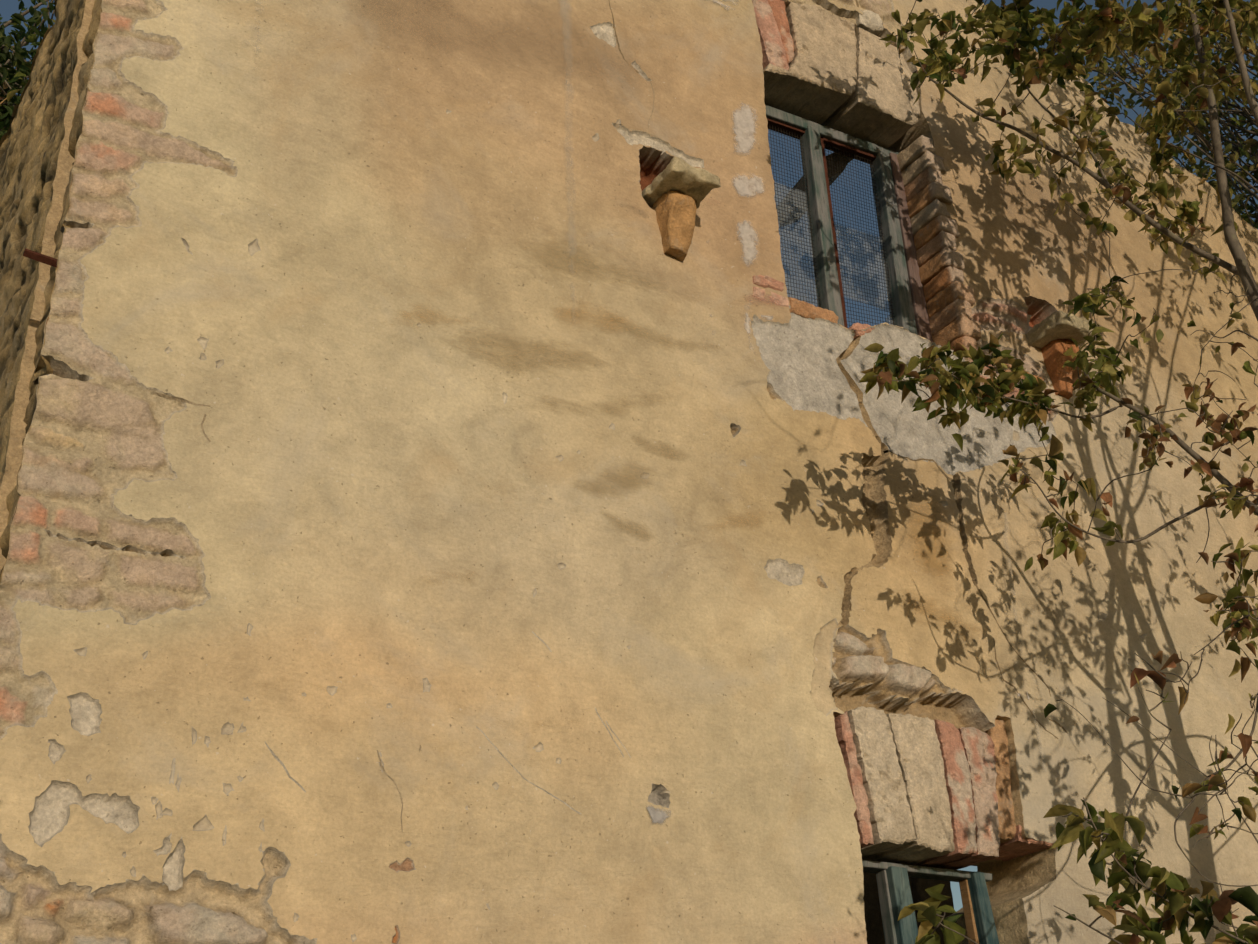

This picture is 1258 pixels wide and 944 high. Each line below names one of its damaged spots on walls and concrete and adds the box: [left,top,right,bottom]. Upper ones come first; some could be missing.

flaking render [812,0,918,73]
flaking render [0,0,238,739]
flaking render [767,382,783,401]
flaking render [964,297,1058,422]
crack [836,330,1068,739]
spalling [810,618,995,732]
flaking render [48,739,66,765]
flaking render [28,774,173,847]
spalling [0,814,317,944]